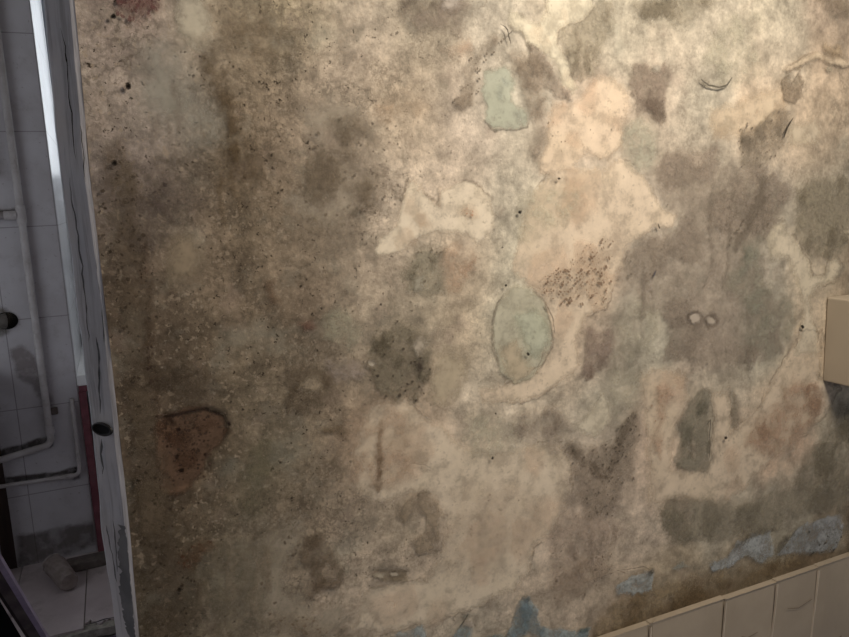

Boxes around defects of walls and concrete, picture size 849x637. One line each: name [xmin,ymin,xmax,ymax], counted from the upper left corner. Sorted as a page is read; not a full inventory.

crack [701,78,732,88]
flaking render [375,181,494,255]
flaking render [482,78,676,402]
flaking render [353,401,571,632]